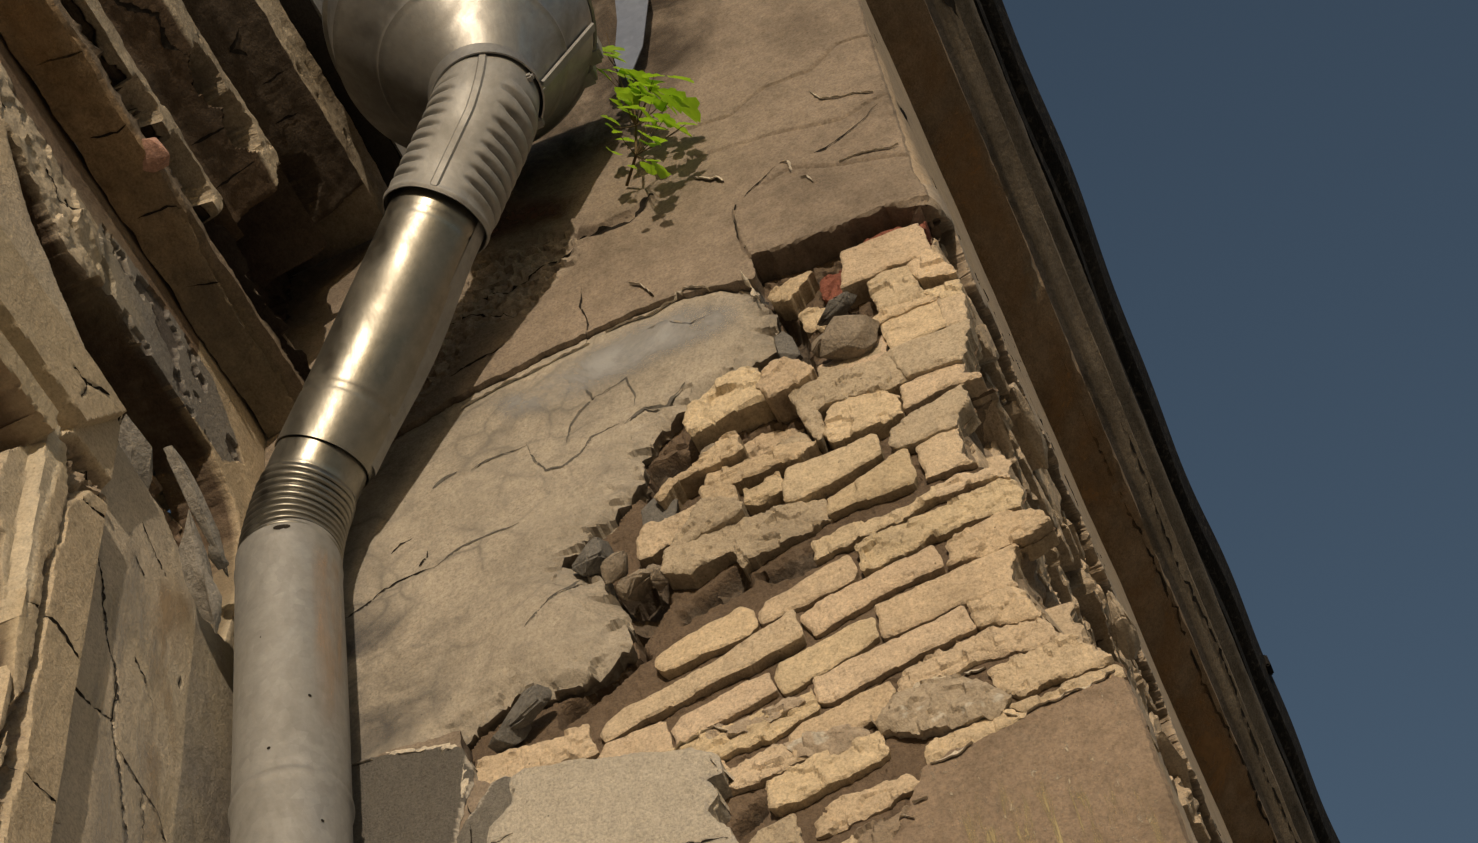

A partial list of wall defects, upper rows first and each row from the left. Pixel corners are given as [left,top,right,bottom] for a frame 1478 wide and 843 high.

flaking render [142,137,170,172]
crack [812,104,908,154]
crack [733,167,774,284]
crack [451,193,654,376]
crack [433,376,685,488]
crack [79,471,105,518]
flaking render [118,414,229,634]
crack [347,523,518,618]
crack [524,575,592,627]
flaking render [343,206,1211,843]
crack [30,558,181,843]
crack [0,744,56,803]